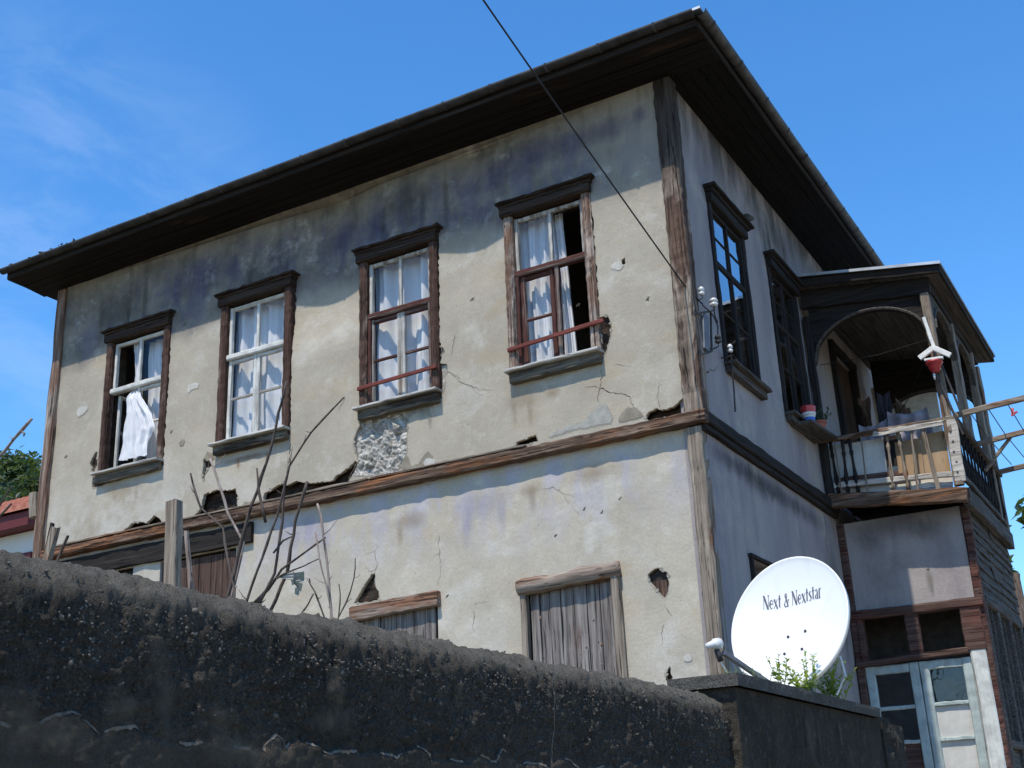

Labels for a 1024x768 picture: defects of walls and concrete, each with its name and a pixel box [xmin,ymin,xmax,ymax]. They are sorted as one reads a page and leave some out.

crack [590,364,660,407]
spalling [643,399,681,421]
spalling [195,413,435,514]